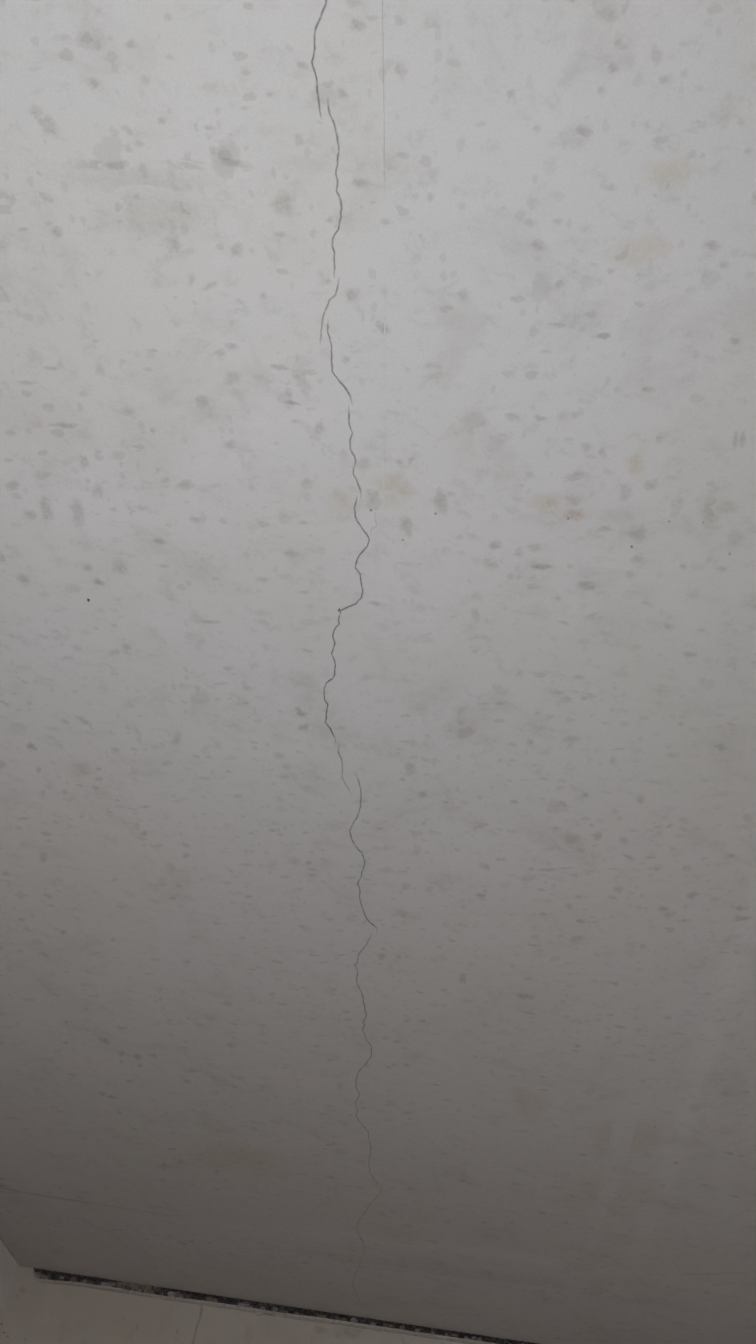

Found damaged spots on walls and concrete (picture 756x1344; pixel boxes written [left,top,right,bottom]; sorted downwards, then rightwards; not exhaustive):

crack [310,0,382,1311]